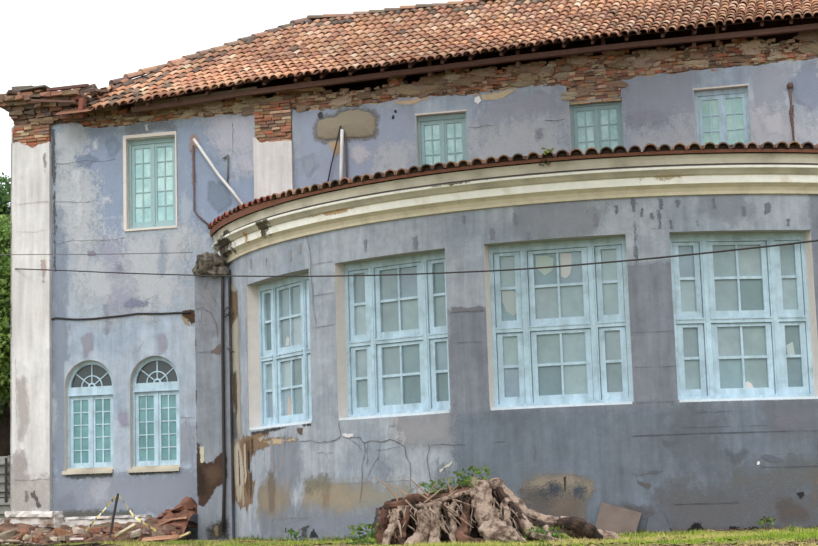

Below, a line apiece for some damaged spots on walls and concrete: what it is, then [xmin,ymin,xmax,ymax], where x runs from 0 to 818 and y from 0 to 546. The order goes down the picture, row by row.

flaking render [254,100,292,143]
peeling [474,88,517,104]
flaking render [568,70,622,106]
peeling [196,278,311,513]
crack [300,418,466,503]
leakage [392,408,596,523]